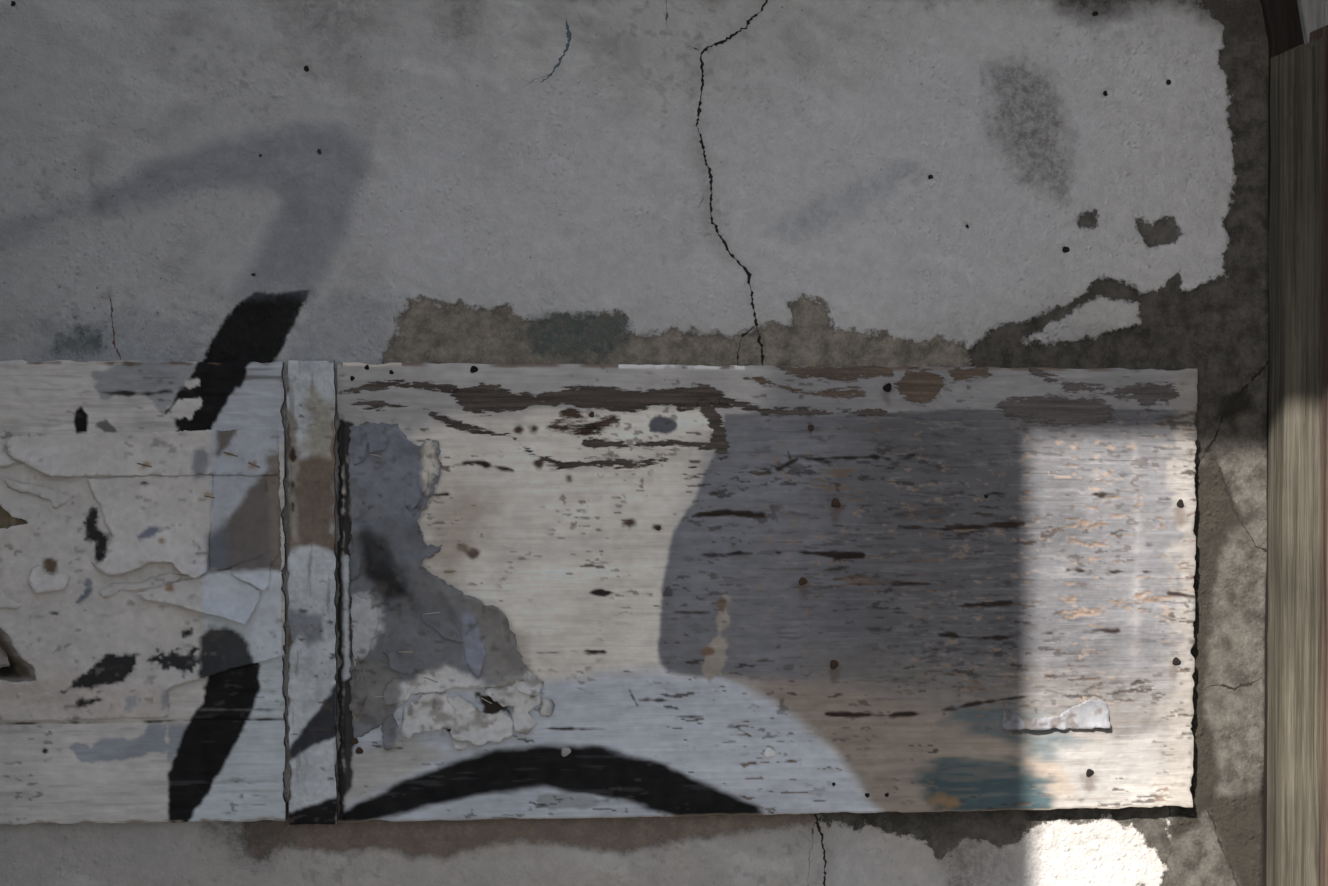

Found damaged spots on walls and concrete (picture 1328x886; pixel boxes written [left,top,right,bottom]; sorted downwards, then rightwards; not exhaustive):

crack [665,0,768,366]
peeling [337,0,1269,886]
crack [807,814,827,886]